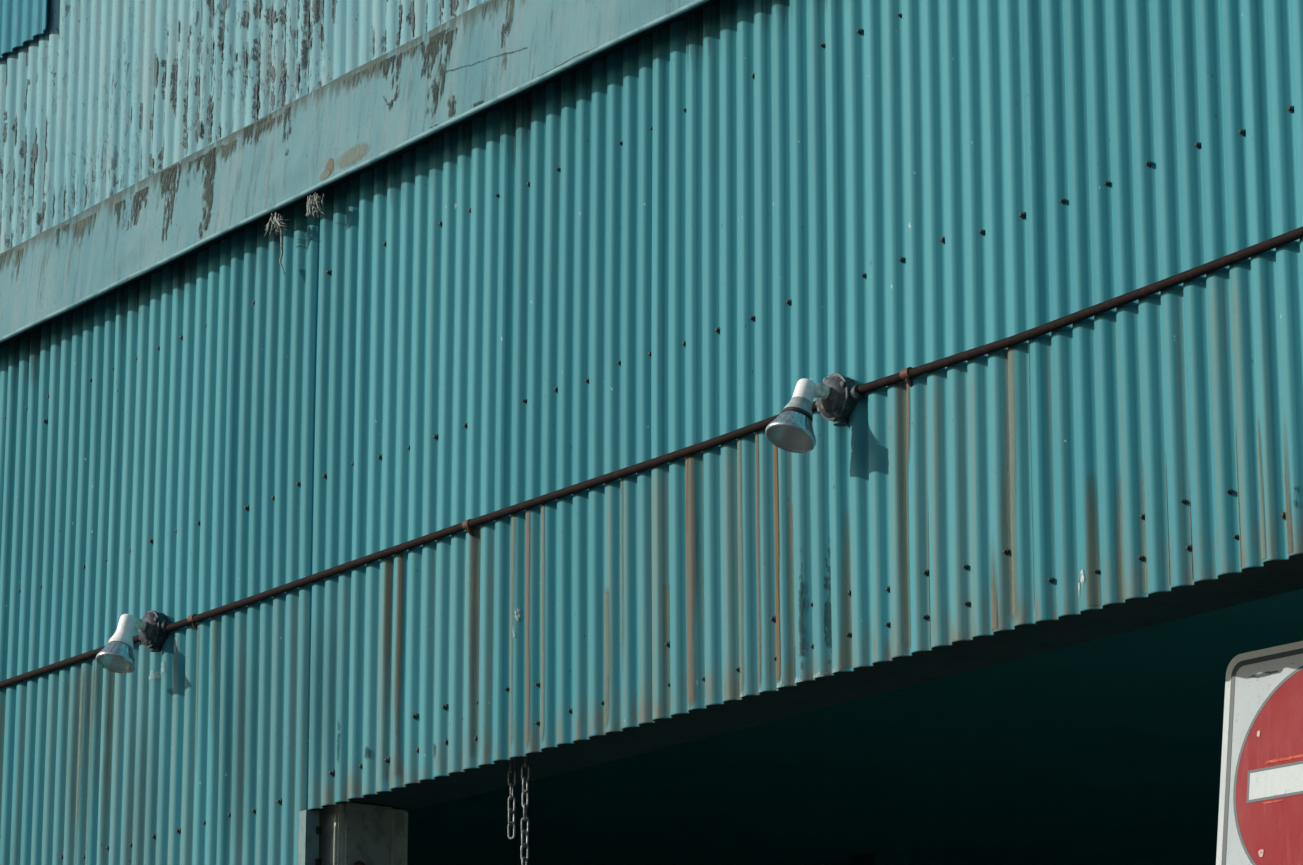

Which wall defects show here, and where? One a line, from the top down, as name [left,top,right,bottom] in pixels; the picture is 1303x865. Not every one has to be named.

peeling [0,48,86,247]
peeling [130,0,336,176]
peeling [372,0,469,54]
rust [384,552,403,749]
rust [470,525,481,710]
rust [510,504,544,746]
rust [685,451,703,704]
rust [737,432,805,686]
rust [824,539,853,667]
rust [896,380,911,647]
rust [991,340,1031,631]
rust [1086,492,1101,605]